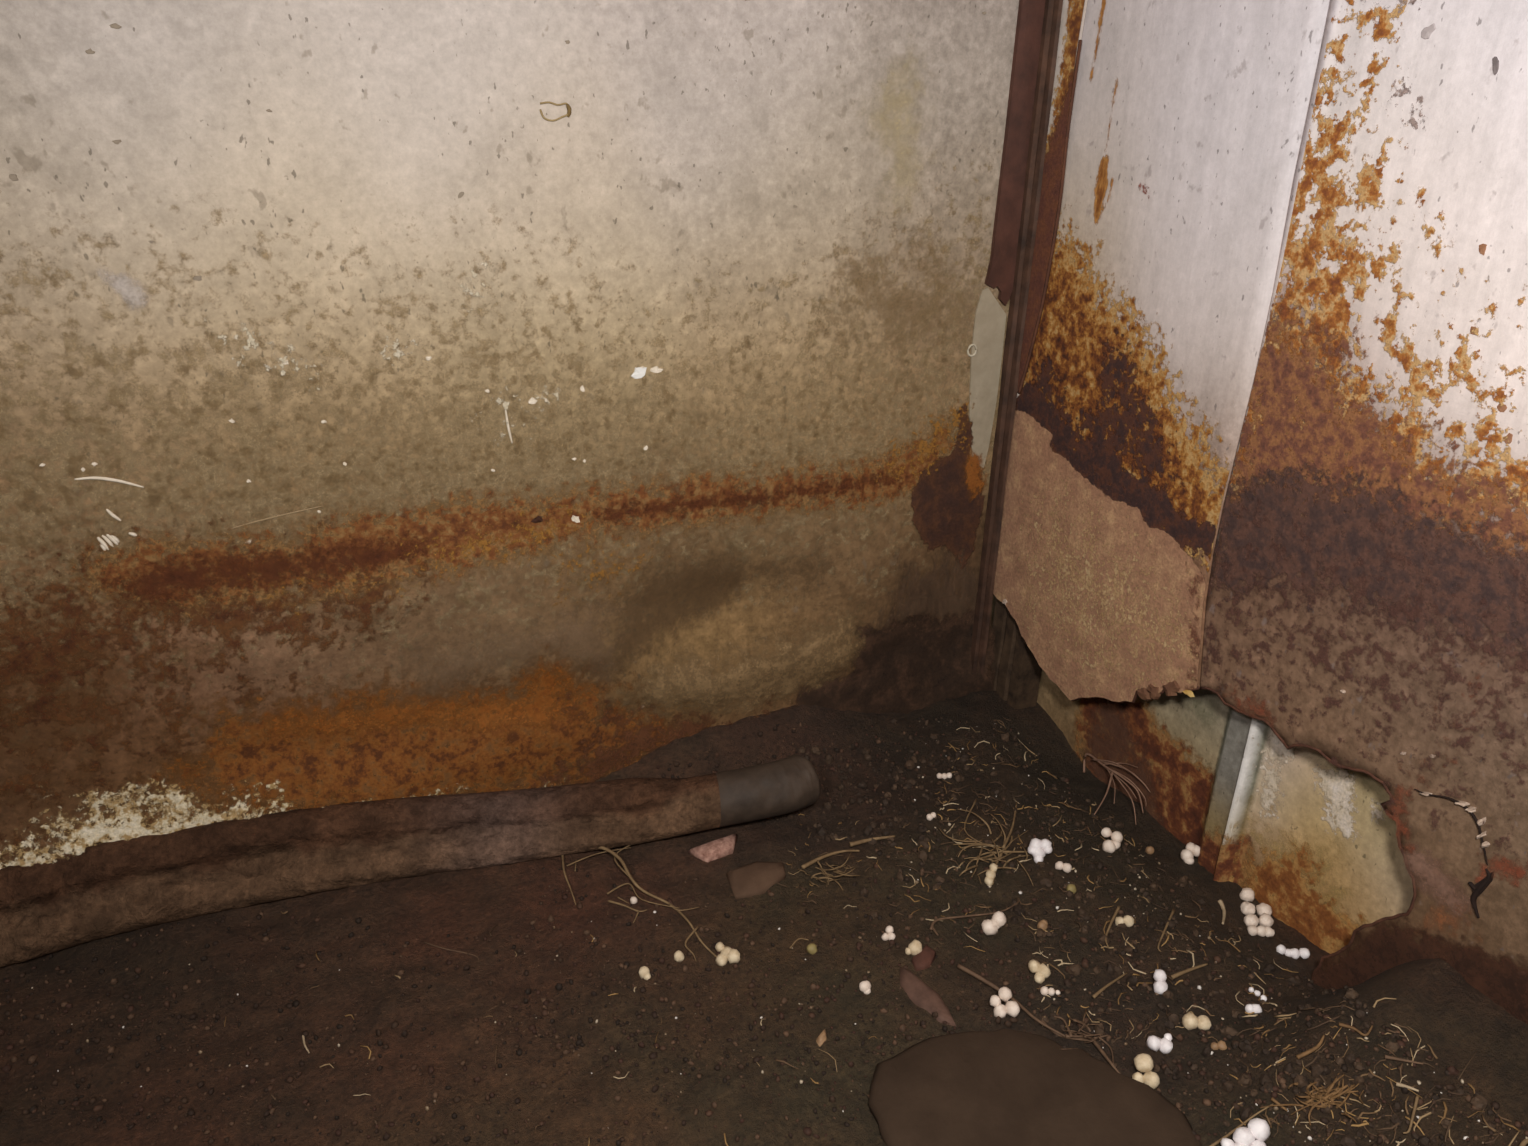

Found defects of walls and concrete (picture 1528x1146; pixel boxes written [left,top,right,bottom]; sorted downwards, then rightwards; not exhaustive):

efflorescence [0,778,293,869]
corrosion [0,393,986,858]
corrosion [1015,0,1528,954]